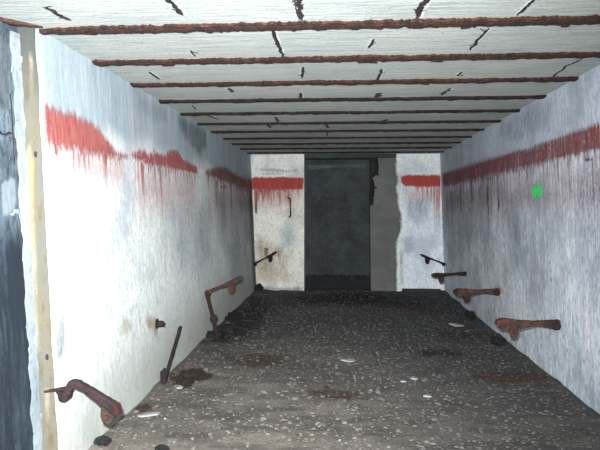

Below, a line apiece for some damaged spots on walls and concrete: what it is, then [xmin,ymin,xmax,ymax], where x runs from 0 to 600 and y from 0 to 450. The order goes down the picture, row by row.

crack [43,6,71,21]
crack [165,0,187,16]
crack [292,0,305,21]
crack [413,0,432,18]
crack [515,0,535,16]
crack [272,31,285,57]
crack [469,28,491,50]
crack [552,59,584,77]